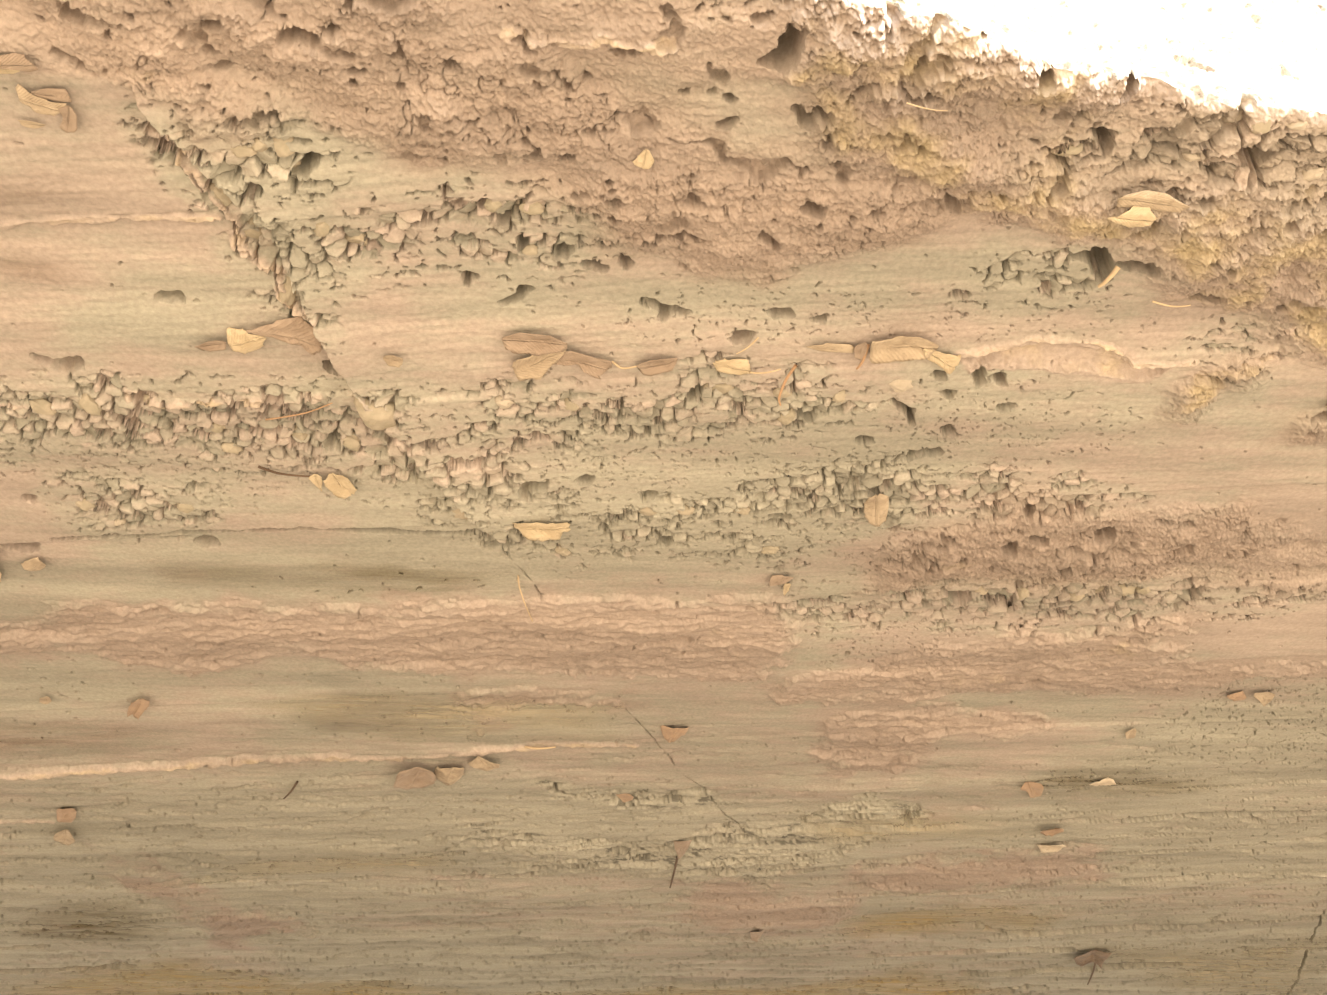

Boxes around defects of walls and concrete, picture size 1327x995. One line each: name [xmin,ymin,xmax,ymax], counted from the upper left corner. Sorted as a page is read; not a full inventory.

spalling [616,271,948,352]
spalling [547,286,1169,501]
crack [1286,909,1327,995]